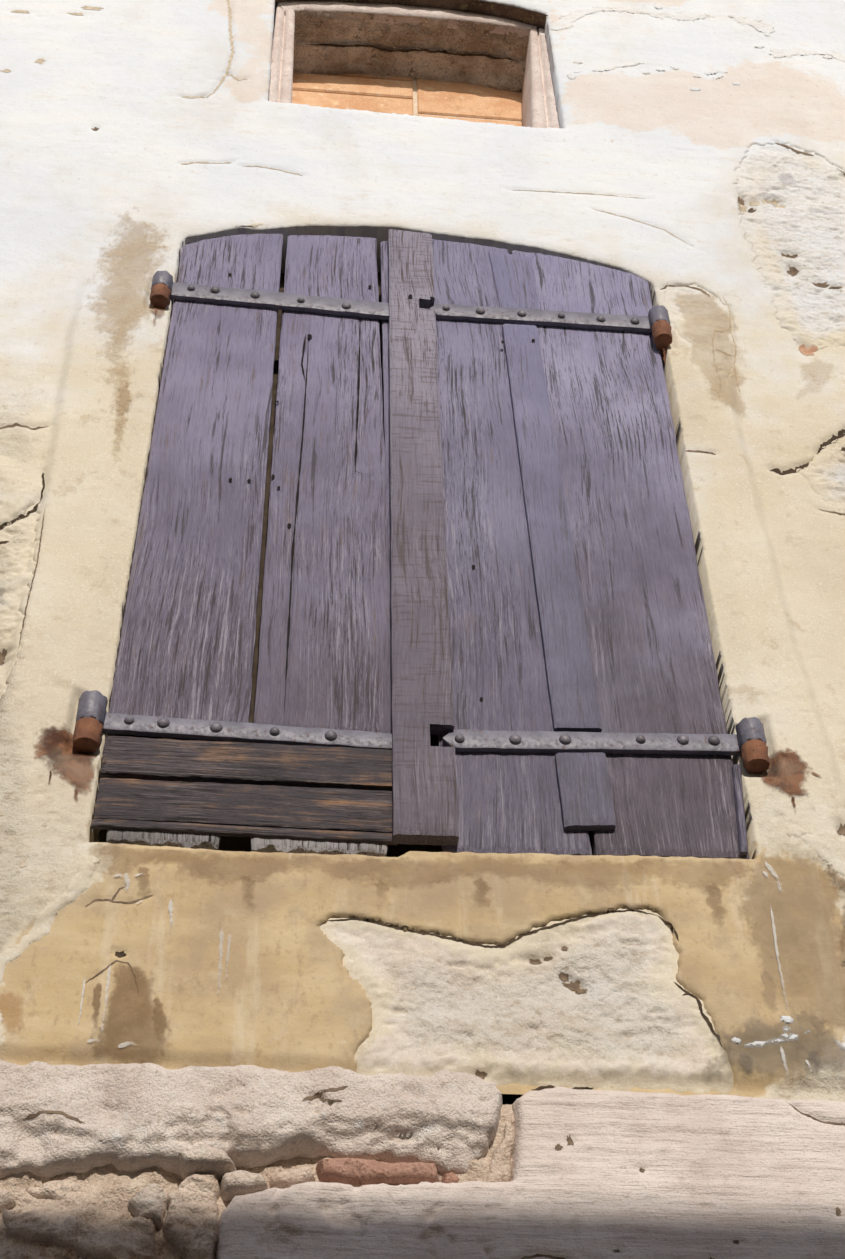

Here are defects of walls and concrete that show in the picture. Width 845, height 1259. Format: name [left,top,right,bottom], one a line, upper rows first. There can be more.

spalling [733,143,845,355]
crack [770,429,845,475]
spalling [795,433,845,513]
crack [0,473,45,646]
spalling [0,504,40,699]
corrosion [36,727,96,800]
corrosion [762,749,820,807]
damp [771,910,783,983]
damp [80,977,101,1015]
spalling [320,908,810,1095]